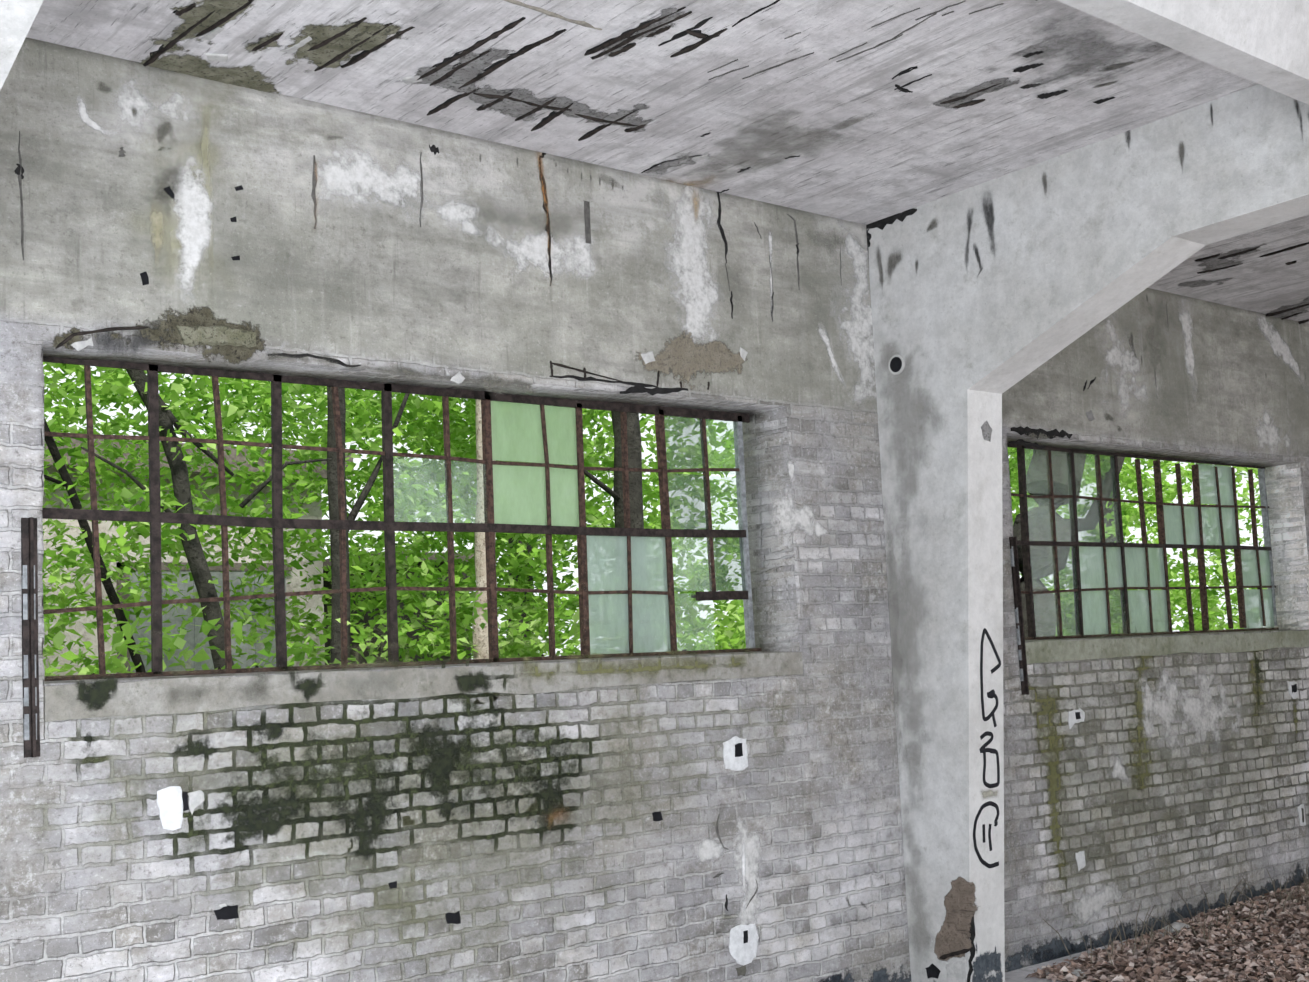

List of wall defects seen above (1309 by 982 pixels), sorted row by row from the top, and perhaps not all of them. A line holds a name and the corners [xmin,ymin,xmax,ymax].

spalling [139,0,415,94]
spalling [401,17,651,141]
spalling [584,7,728,60]
damp [151,123,212,291]
crack [539,152,552,286]
damp [666,186,718,343]
spalling [53,306,531,393]
peeling [549,330,748,396]
damp [1136,673,1144,777]
peeling [1141,671,1241,747]
damp [1046,710,1067,892]
spalling [821,864,1309,982]